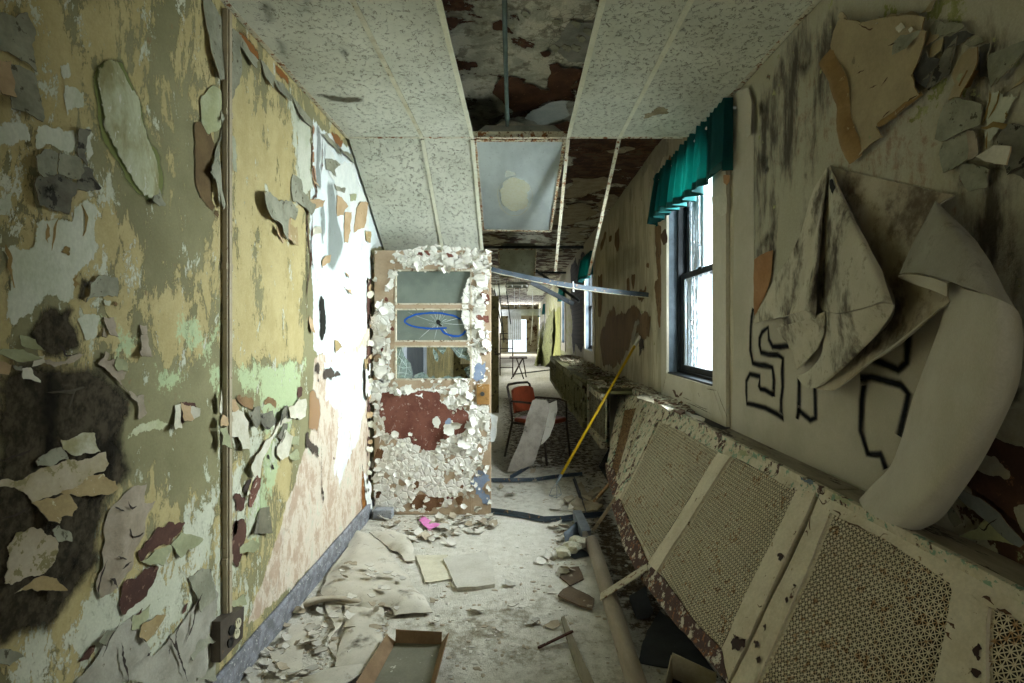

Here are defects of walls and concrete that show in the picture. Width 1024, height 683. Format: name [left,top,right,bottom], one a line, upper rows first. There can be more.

spalling [492,51,582,131]
peeling [0,200,101,383]
peeling [325,142,498,513]
peeling [549,177,642,356]
peeling [598,224,668,368]
peeling [0,432,118,593]
water stain [0,279,130,645]
peeling [119,522,203,642]
peeling [128,402,201,439]
peeling [232,475,261,567]
peeling [219,387,307,460]
peeling [967,389,1024,533]